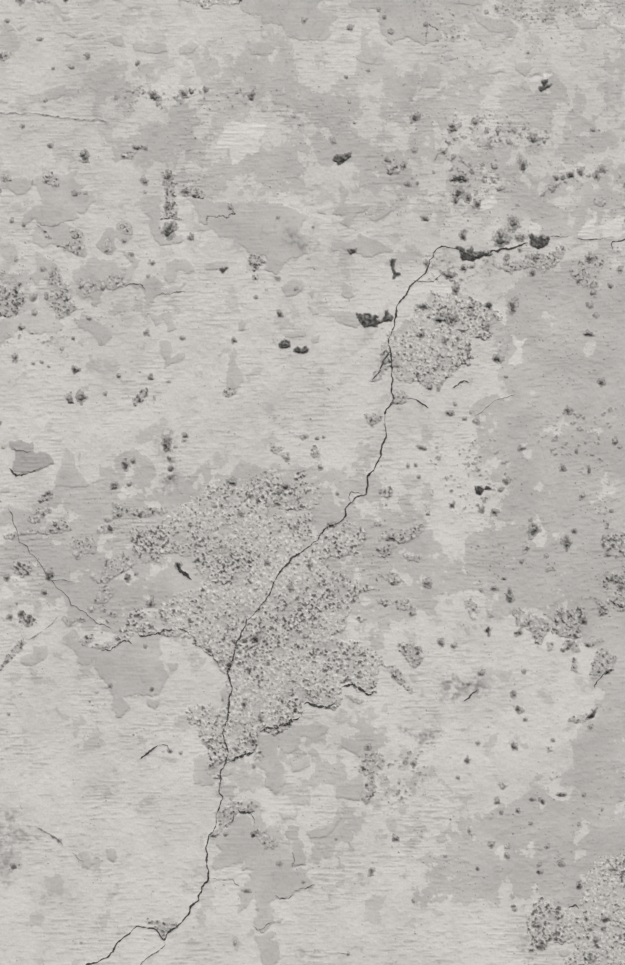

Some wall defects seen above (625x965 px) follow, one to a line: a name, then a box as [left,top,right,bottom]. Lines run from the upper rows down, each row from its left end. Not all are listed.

peeling [347,0,440,72]
spalling [330,137,352,166]
spalling [432,108,625,229]
spalling [143,169,614,405]
crack [550,236,625,248]
spalling [64,389,89,405]
spalling [132,373,156,406]
crack [8,509,110,628]
spalling [0,432,528,795]
crack [86,243,526,965]
spalling [464,509,625,687]
spalling [509,852,625,965]